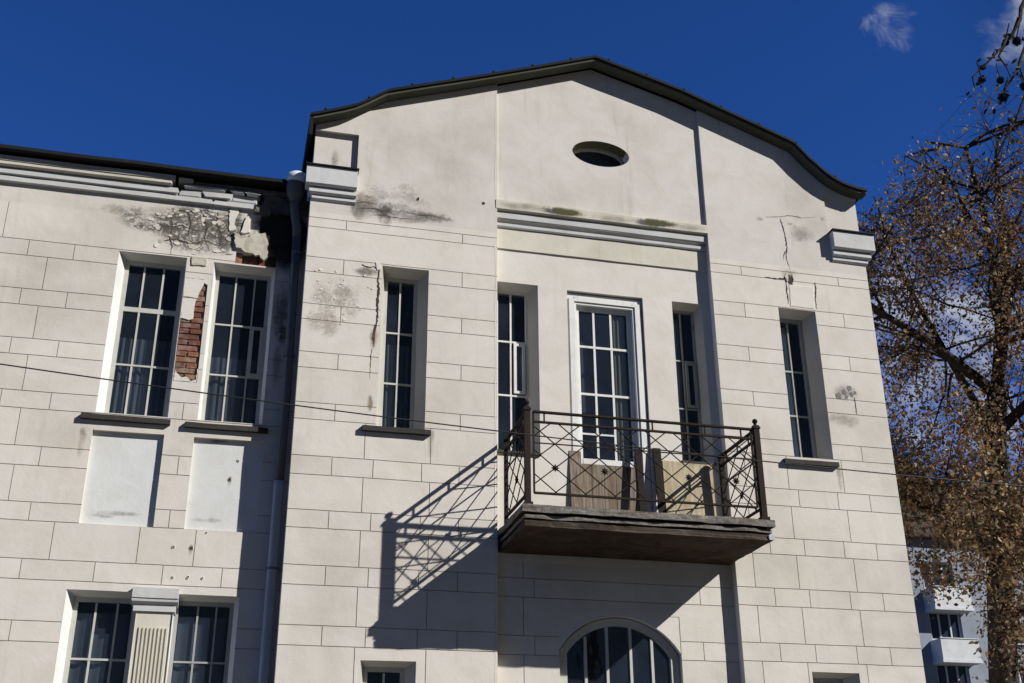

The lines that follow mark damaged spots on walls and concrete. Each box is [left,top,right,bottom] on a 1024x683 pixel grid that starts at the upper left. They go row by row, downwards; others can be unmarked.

peeling [147,207,236,255]
leakage [356,196,445,220]
crack [768,215,817,309]
spalling [173,278,208,383]
crack [362,262,381,372]
spalling [835,386,857,410]